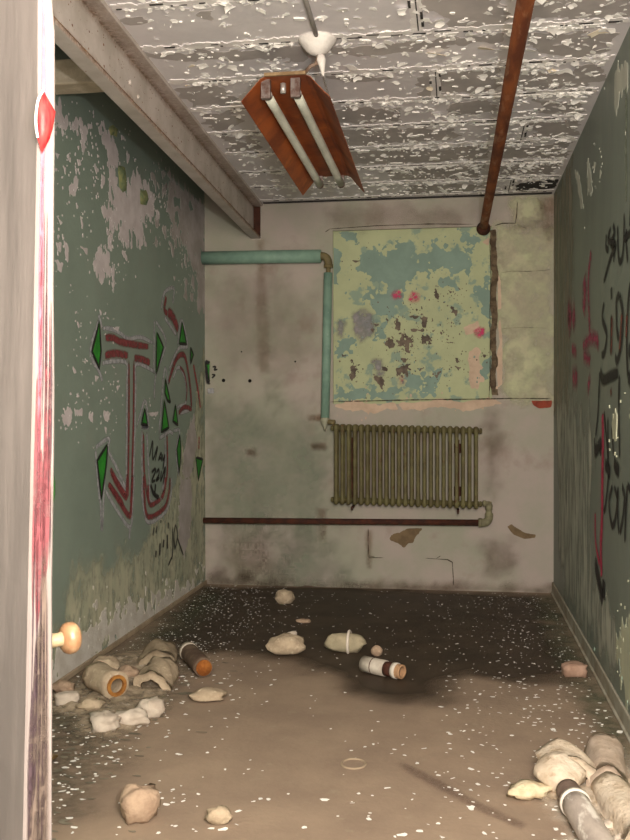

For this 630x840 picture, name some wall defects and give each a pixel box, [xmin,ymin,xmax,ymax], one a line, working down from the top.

peeling [54,97,205,315]
peeling [334,0,630,710]
peeling [52,354,239,684]
leakage [232,437,322,518]
leakage [159,565,572,700]